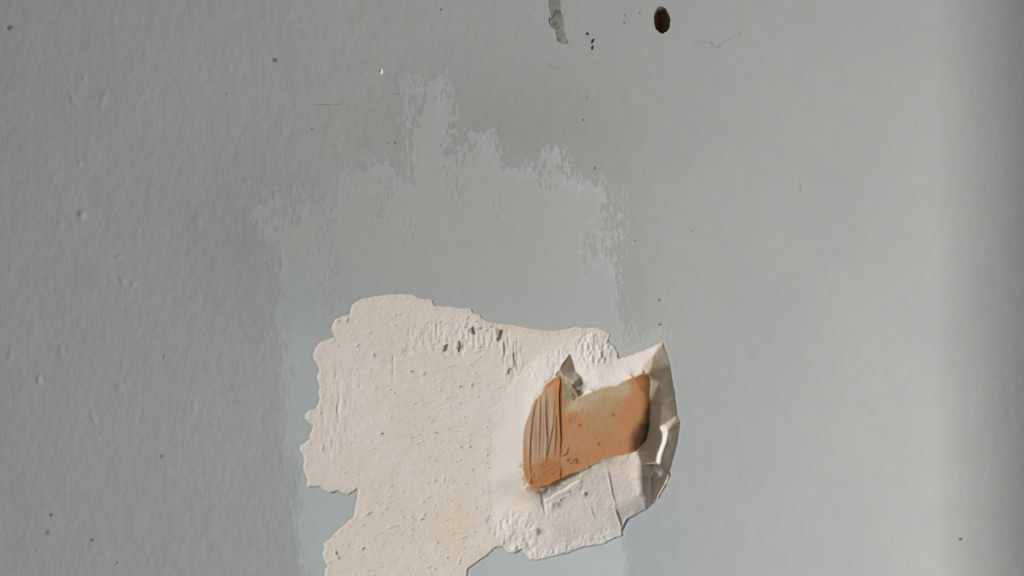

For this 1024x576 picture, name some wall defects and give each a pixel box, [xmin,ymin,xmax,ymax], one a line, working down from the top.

peeling [249,68,680,576]